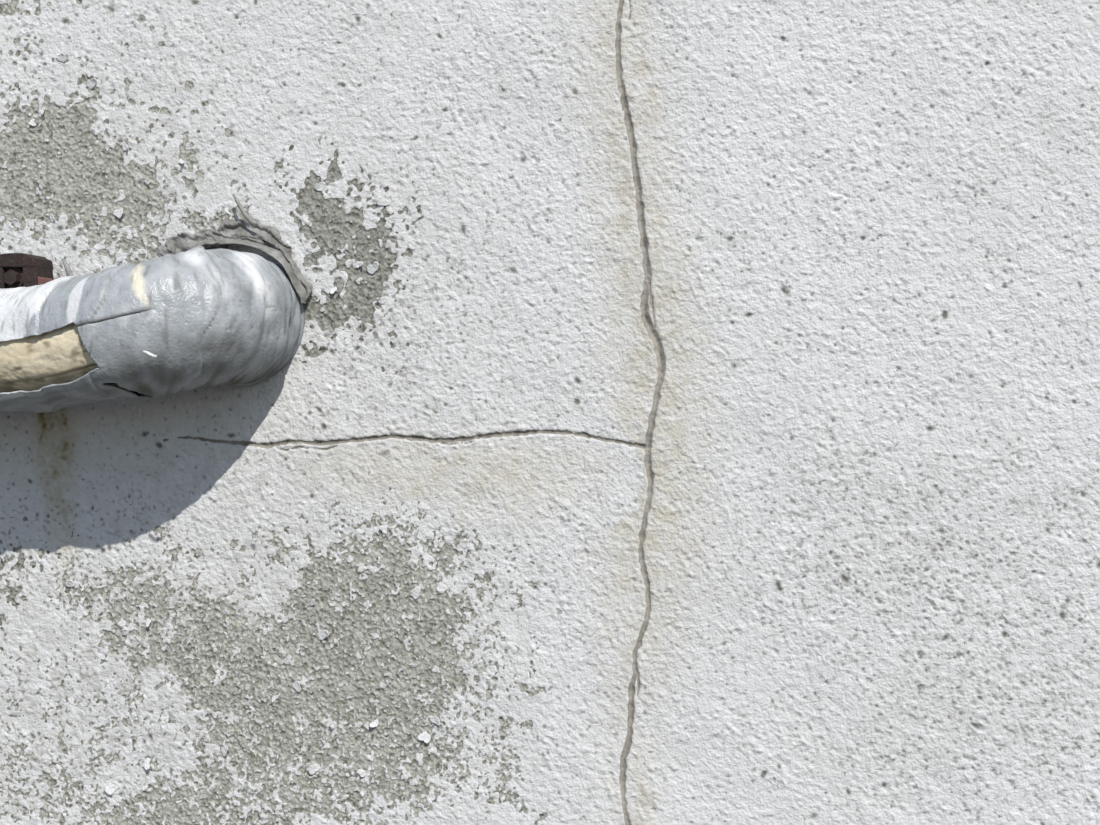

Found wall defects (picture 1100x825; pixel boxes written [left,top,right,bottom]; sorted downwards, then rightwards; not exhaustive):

peeling [0,0,252,279]
peeling [274,139,424,363]
crack [163,0,666,825]
peeling [0,488,548,825]